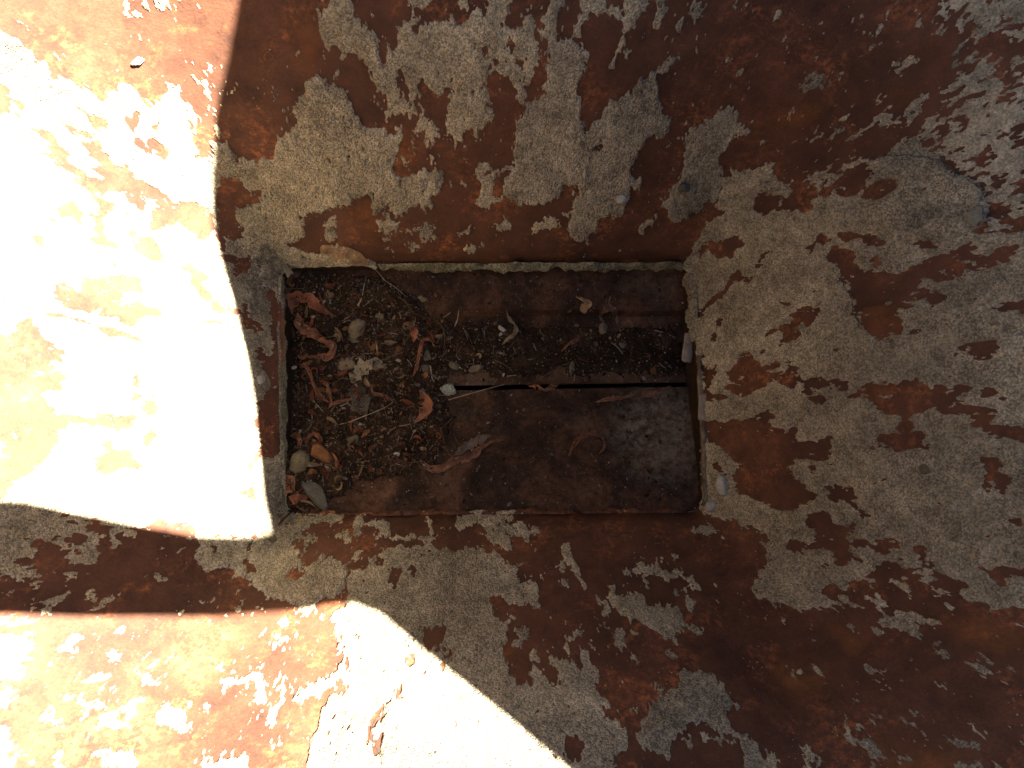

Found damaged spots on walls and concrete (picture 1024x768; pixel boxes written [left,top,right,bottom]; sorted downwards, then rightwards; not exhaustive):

peeling [642,0,708,43]
peeling [792,0,1024,235]
peeling [371,208,420,261]
rust [805,232,1019,337]
rust [991,300,1024,313]
rust [953,340,1000,361]
rust [725,352,1024,452]
peeling [830,567,954,637]
rust [978,566,1024,586]
rust [563,734,585,761]
peeling [755,749,781,768]
peeling [900,709,1002,768]